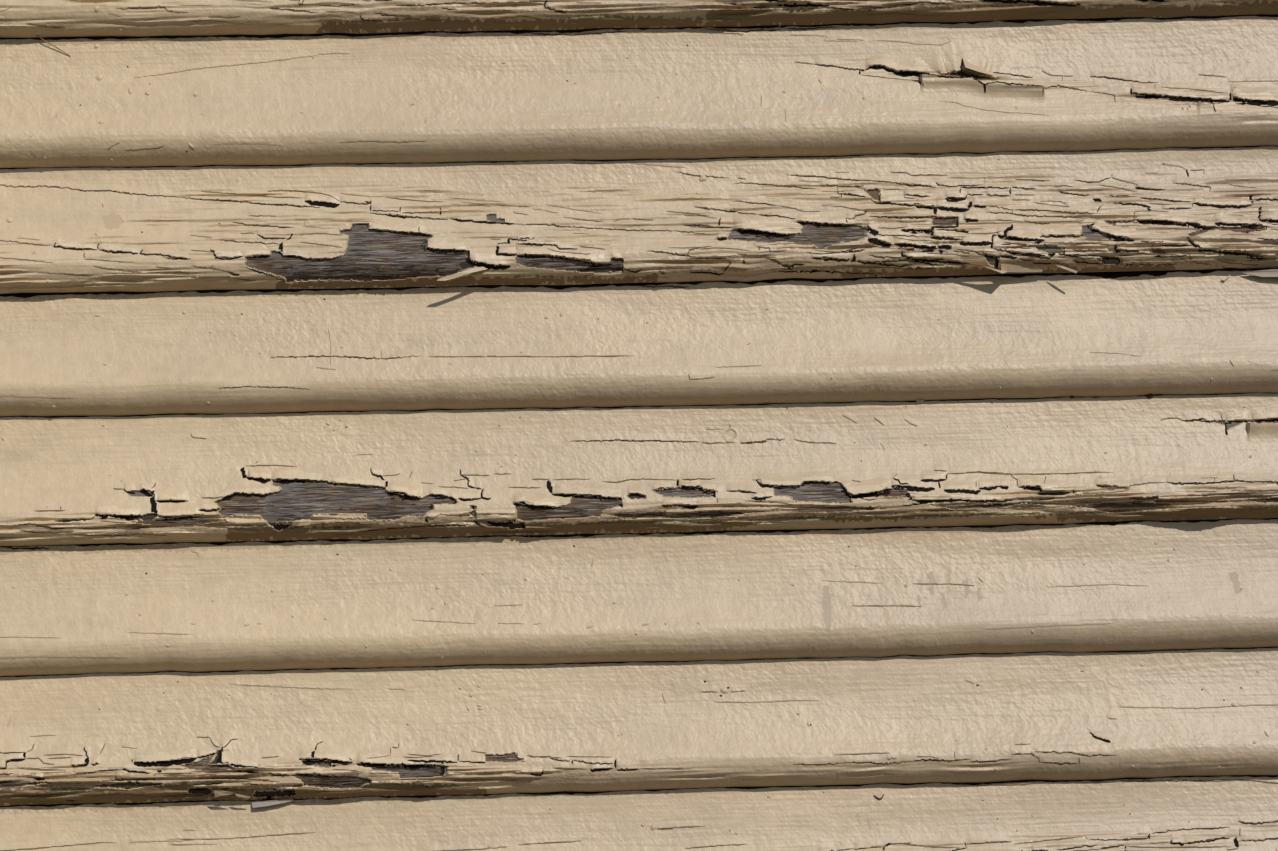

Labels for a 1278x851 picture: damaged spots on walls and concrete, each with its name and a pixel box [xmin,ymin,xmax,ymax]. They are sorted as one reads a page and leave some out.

peeling [1133,85,1278,100]
peeling [213,209,623,282]
peeling [718,190,1278,281]
peeling [81,465,749,526]
peeling [752,462,1070,513]
peeling [92,747,455,808]
crack [0,735,680,801]
peeling [486,753,542,774]
crack [794,705,1278,786]
crack [0,830,315,851]
crack [442,841,576,851]
crack [657,826,744,849]